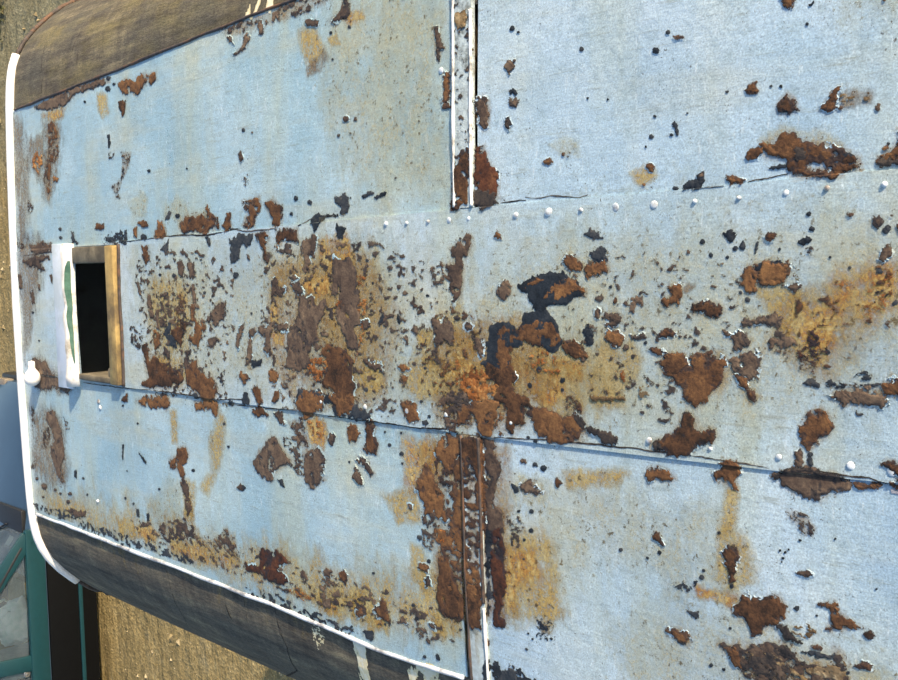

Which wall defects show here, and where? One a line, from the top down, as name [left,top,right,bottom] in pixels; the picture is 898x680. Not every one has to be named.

rust [27,72,156,200]
rust [474,95,490,132]
rust [449,145,500,211]
peeling [725,175,747,186]
peeling [588,270,676,423]
rust [644,214,898,486]
rust [31,197,639,651]
crack [494,437,766,468]
rust [769,408,898,502]
crack [821,471,884,483]
rust [482,659,536,680]
peeling [800,644,836,660]